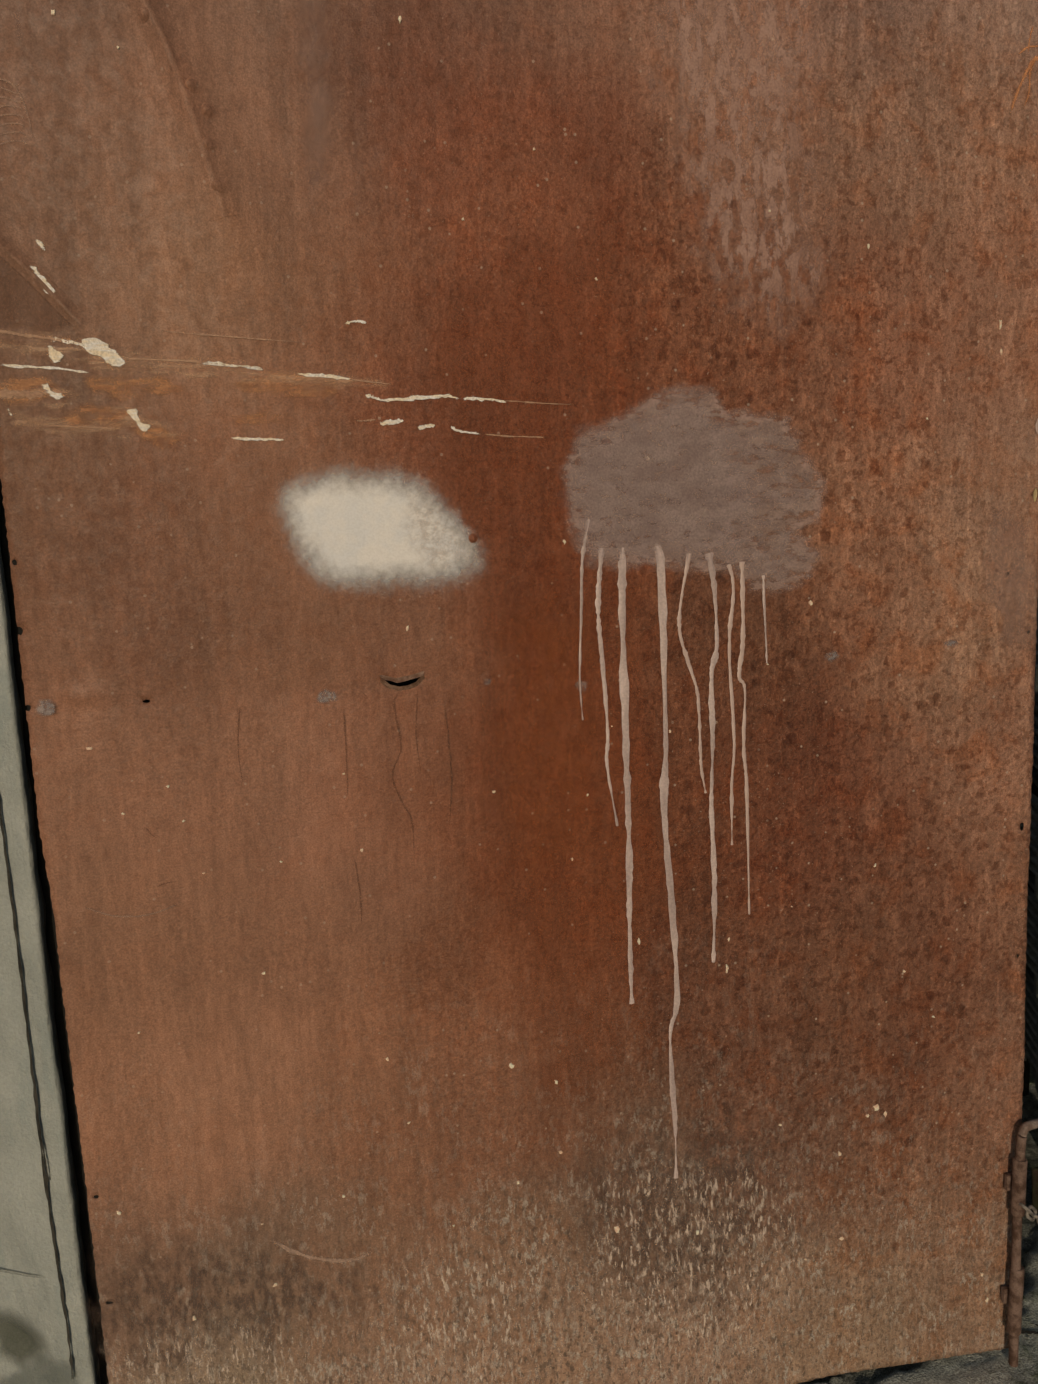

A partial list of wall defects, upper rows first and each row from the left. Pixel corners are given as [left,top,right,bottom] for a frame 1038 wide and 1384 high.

peeling [31,266,55,294]
peeling [48,346,64,363]
peeling [82,338,125,367]
peeling [43,384,63,399]
peeling [127,408,150,431]
water stain [277,1243,367,1263]
efflorescence [585,1171,799,1381]
efflorescence [381,1250,552,1384]
water stain [120,1334,320,1384]